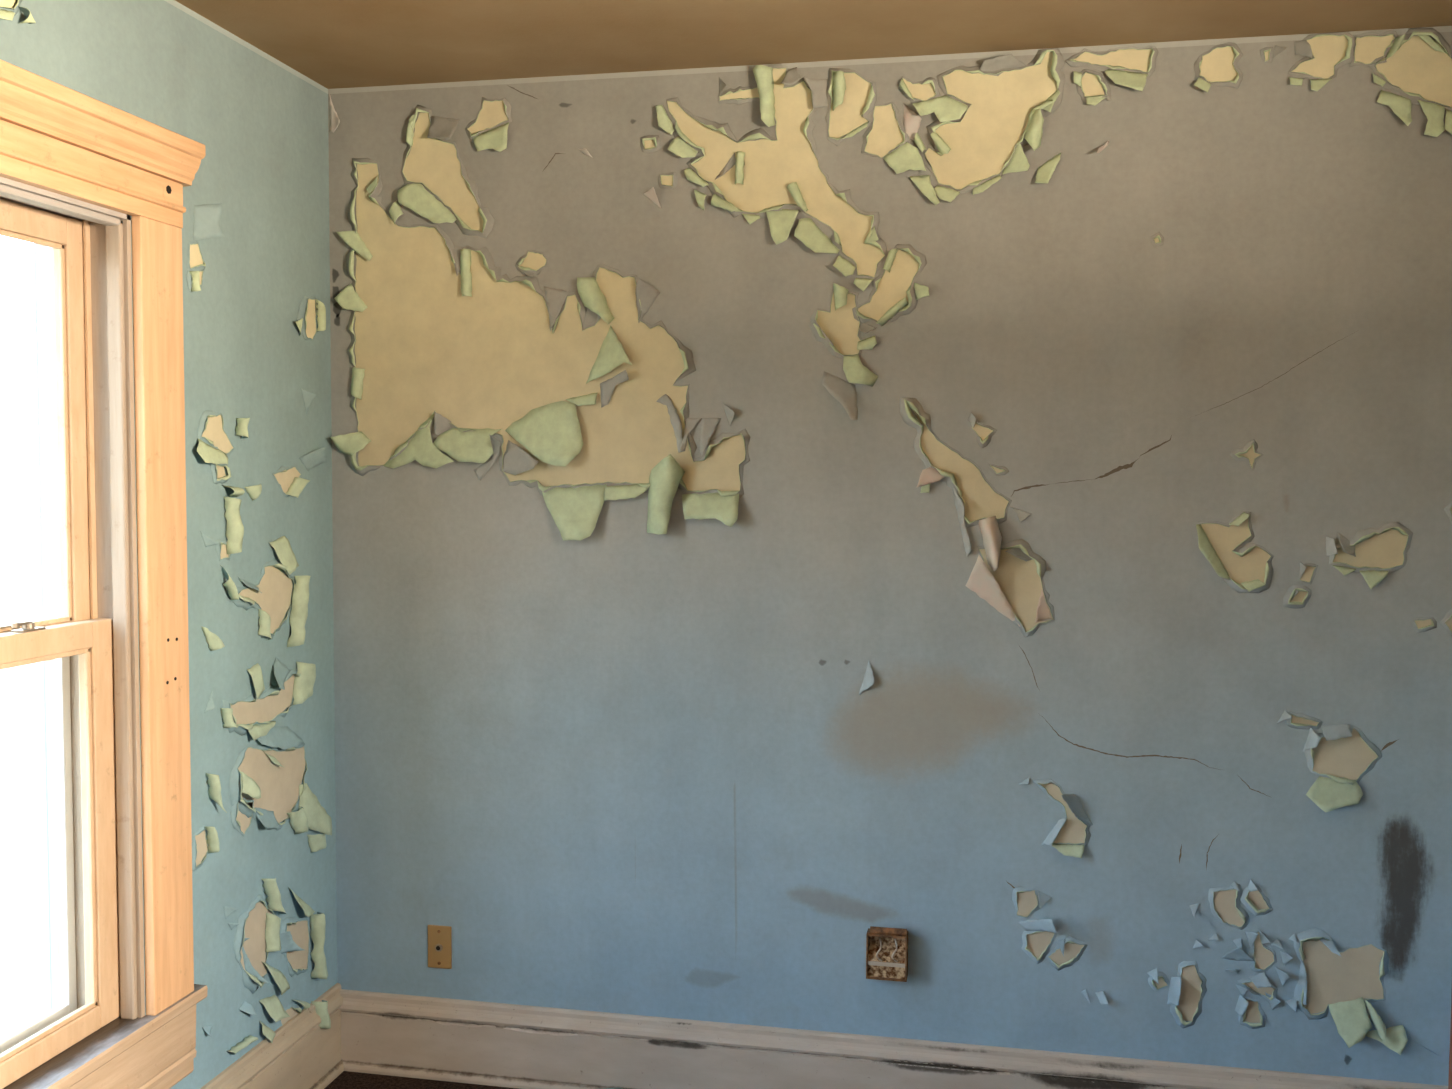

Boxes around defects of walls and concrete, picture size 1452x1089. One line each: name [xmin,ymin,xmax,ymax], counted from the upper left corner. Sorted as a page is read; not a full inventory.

peeling [1194,28,1452,137]
peeling [640,45,1158,420]
peeling [192,94,750,871]
peeling [900,397,1055,637]
crack [1012,331,1357,495]
peeling [1196,511,1413,608]
water stain [797,642,1070,804]
crack [1019,646,1270,797]
peeling [1278,710,1382,812]
peeling [228,878,331,1055]
peeling [1147,880,1439,1056]
water stain [1367,807,1442,991]